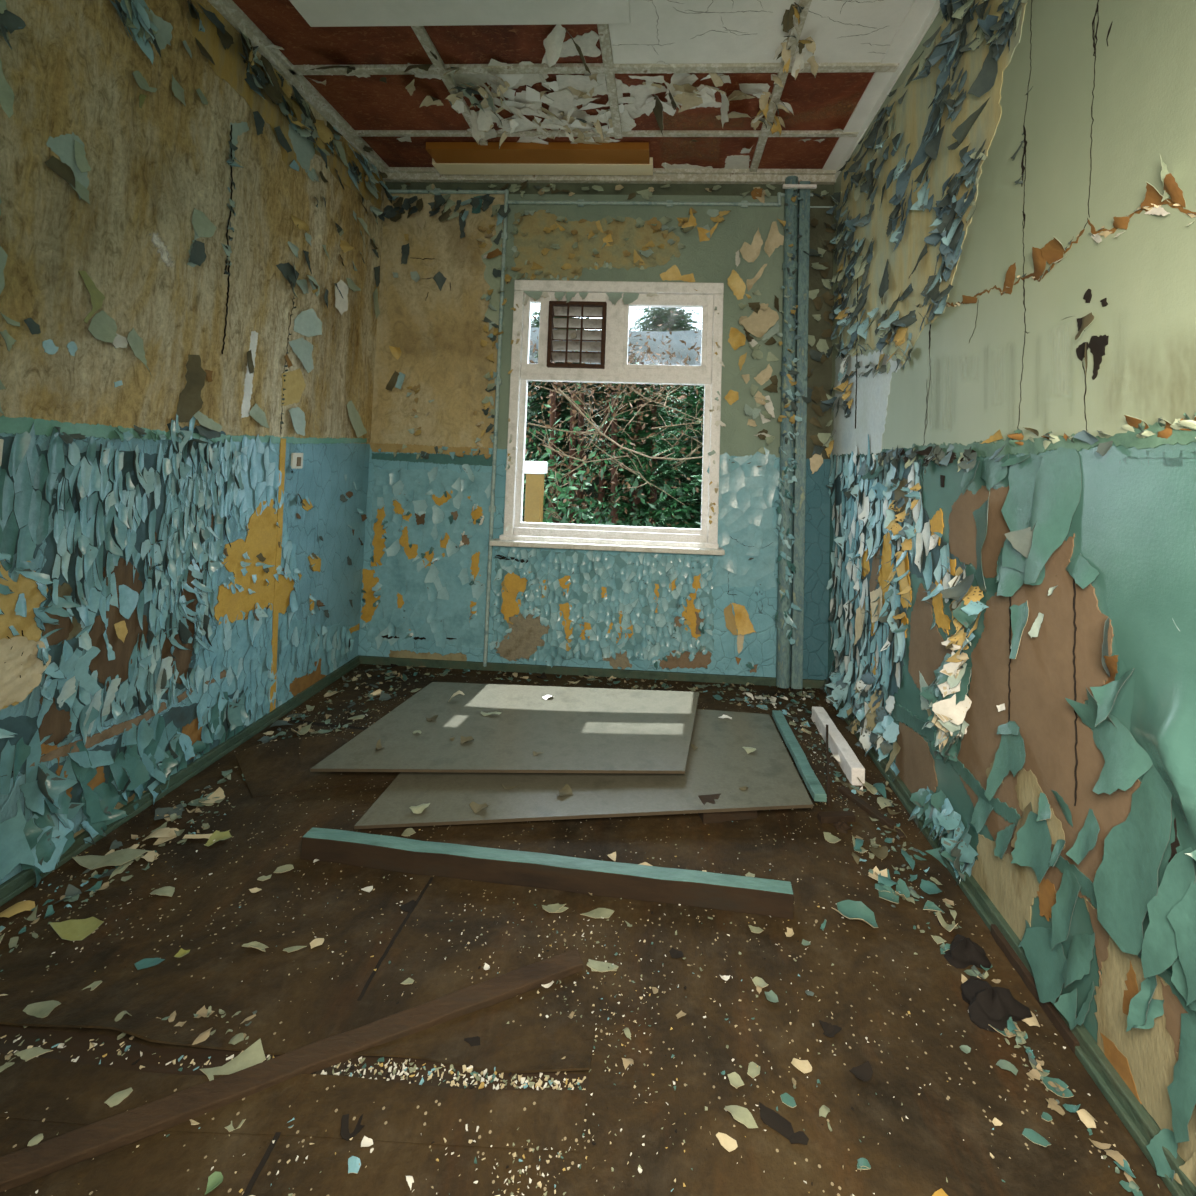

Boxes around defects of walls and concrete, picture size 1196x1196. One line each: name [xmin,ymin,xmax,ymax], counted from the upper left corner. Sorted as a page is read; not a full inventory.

crack [617,0,767,54]
crack [809,0,887,54]
peeling [404,2,819,148]
peeling [661,146,753,169]
crack [221,121,249,354]
crack [826,0,1196,734]
peeling [588,959,619,971]